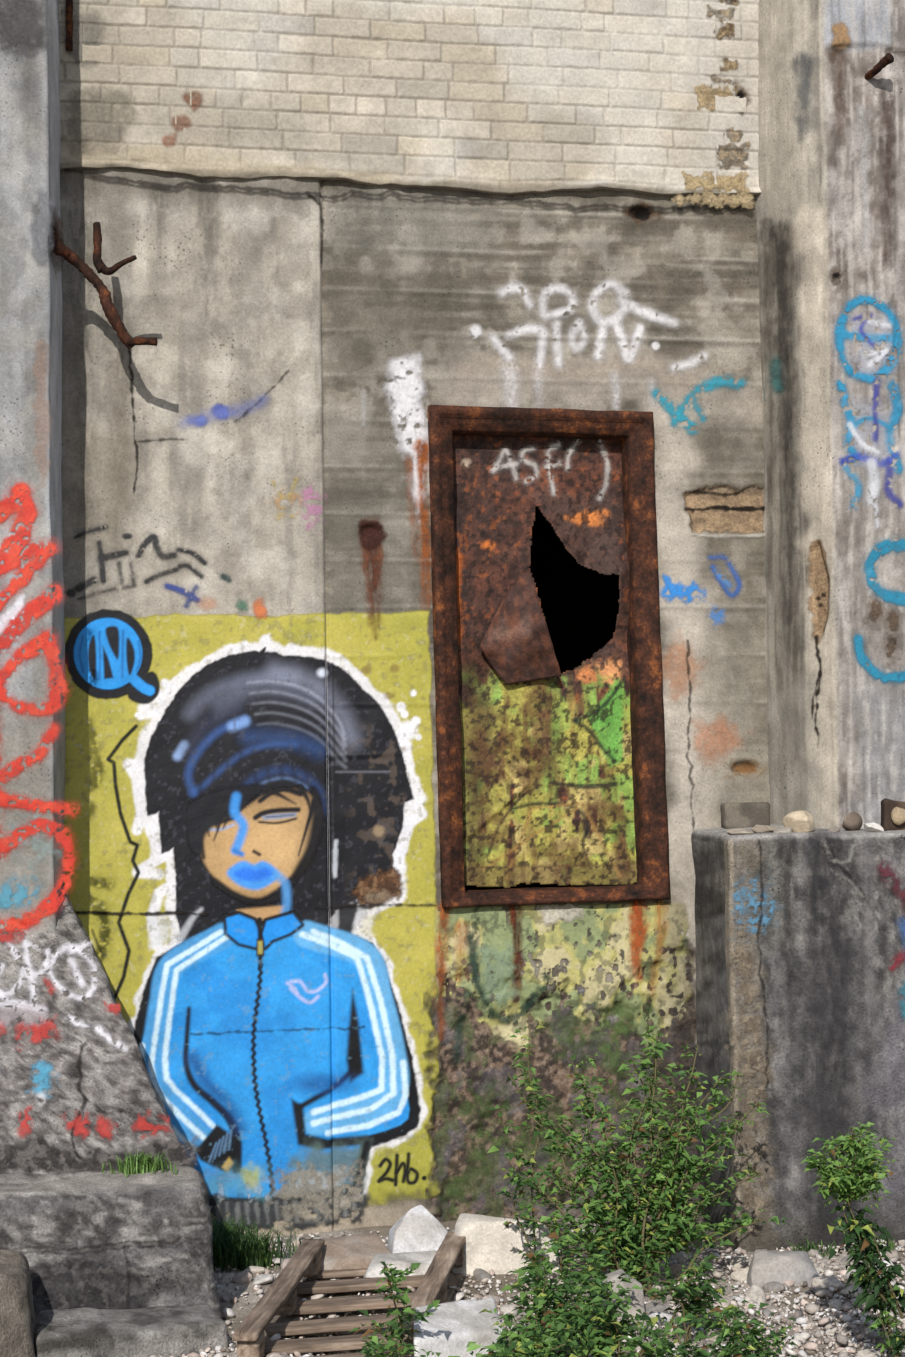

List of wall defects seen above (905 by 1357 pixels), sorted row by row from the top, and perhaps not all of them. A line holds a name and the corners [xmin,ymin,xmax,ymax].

leakage [0,0,50,50]
spalling [707,0,739,40]
spalling [672,58,754,209]
spalling [624,202,660,223]
crack [128,349,184,491]
spalling [683,485,765,537]
rust [359,520,386,618]
spalling [808,539,829,644]
crack [685,640,693,785]
crack [811,636,822,735]
rust [629,900,662,978]